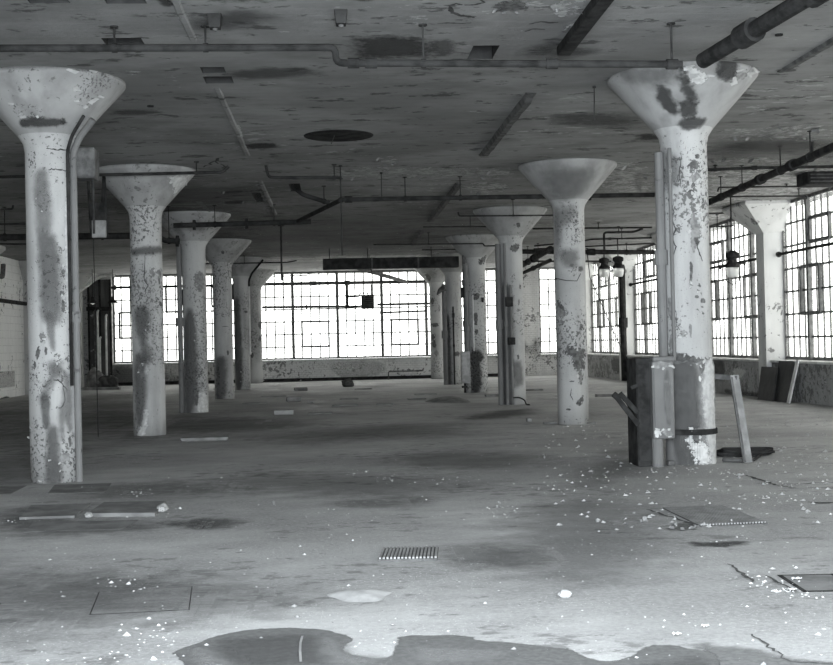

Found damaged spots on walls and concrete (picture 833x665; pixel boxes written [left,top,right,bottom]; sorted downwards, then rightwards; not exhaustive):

damp [222,12,259,26]
damp [354,35,452,58]
damp [624,67,705,130]
damp [36,171,69,349]
peeling [556,300,568,323]
peeling [651,295,710,381]
peeling [27,331,63,401]
peeling [564,344,586,385]
crack [729,564,797,591]
damp [173,628,833,665]